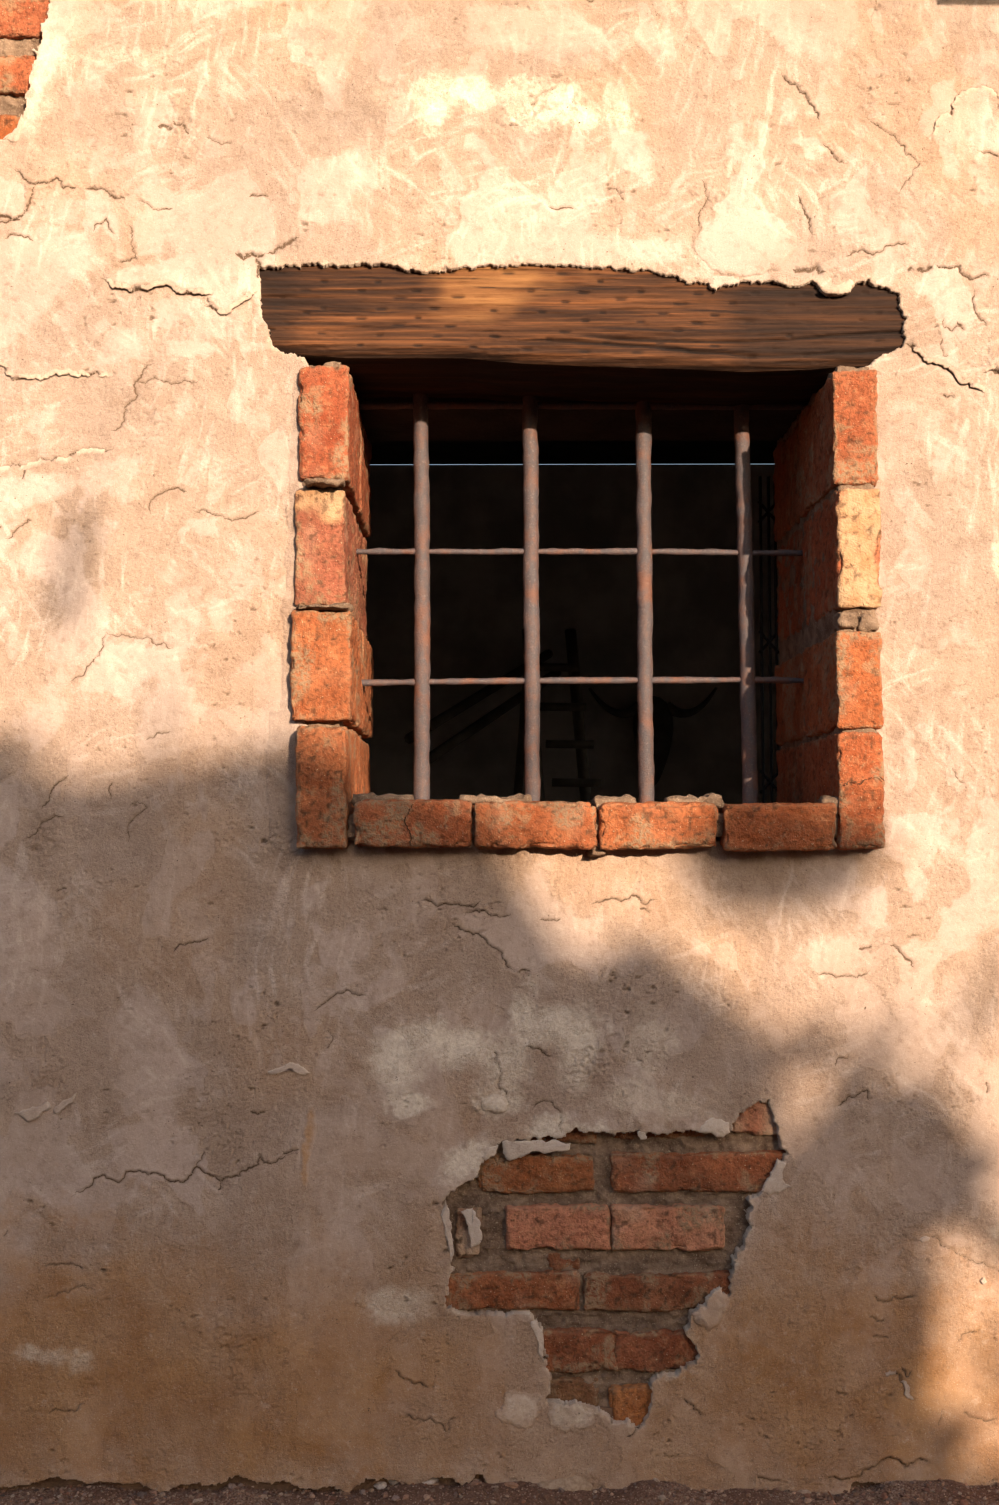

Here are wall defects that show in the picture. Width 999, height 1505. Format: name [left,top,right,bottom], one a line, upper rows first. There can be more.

flaking render [0,0,50,142]
crack [782,75,844,163]
crack [866,86,999,193]
crack [0,170,299,315]
crack [793,196,999,398]
crack [0,360,199,479]
crack [148,487,259,521]
crack [74,1149,299,1195]
water stain [0,1150,553,1493]
flaking render [441,1100,791,1426]